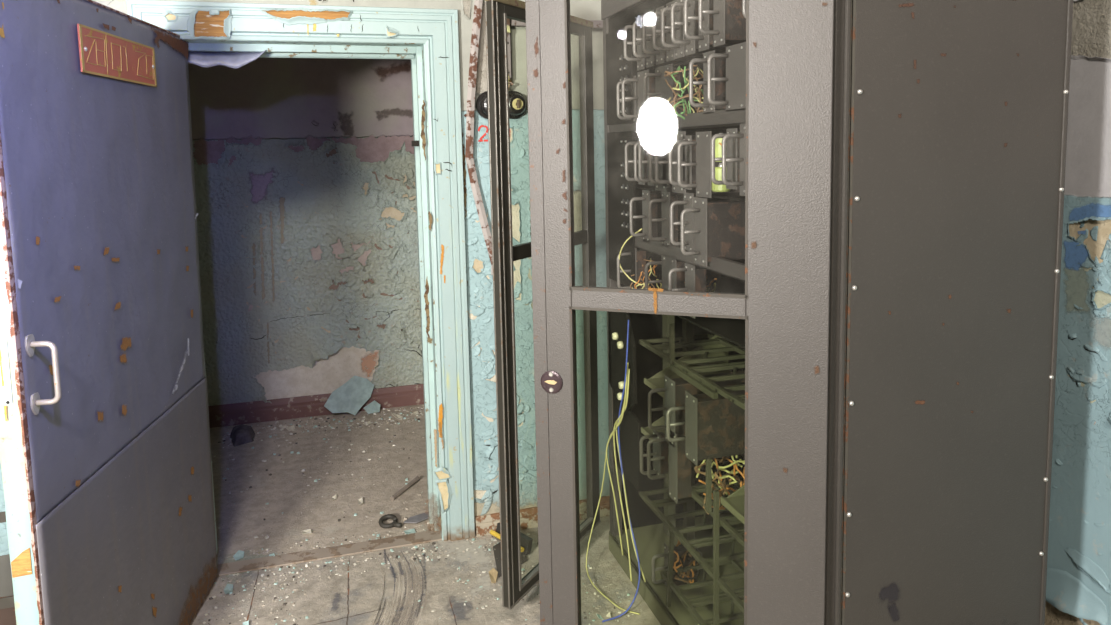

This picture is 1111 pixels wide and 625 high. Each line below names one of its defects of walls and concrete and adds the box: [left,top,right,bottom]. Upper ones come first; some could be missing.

peeling [259,0,352,25]
peeling [192,137,229,170]
spalling [252,134,422,403]
peeling [464,180,494,323]
peeling [510,127,531,246]
peeling [513,257,533,331]
peeling [573,180,582,232]
peeling [1067,216,1111,318]
peeling [469,337,497,445]
peeling [473,464,499,515]
peeling [517,395,537,490]
spalling [1045,548,1111,625]